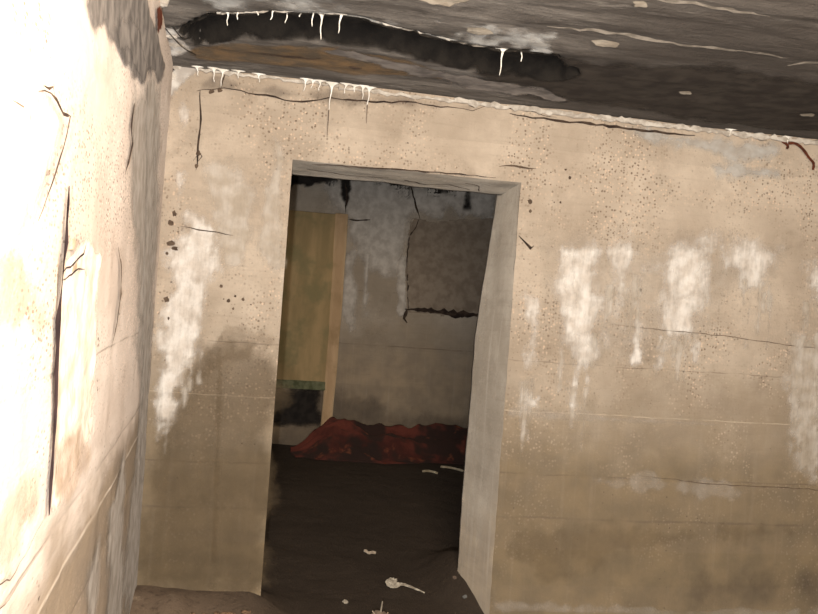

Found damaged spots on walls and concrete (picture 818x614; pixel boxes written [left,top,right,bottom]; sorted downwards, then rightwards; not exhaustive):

crack [193,75,485,169]
spalling [179,11,581,82]
water stain [374,20,489,47]
water stain [171,35,818,157]
crack [0,86,87,609]
crack [111,247,122,347]
water stain [88,0,253,614]
water stain [273,379,325,426]
water stain [291,175,494,330]
crack [308,165,536,323]
water stain [556,244,641,419]
water stain [659,237,713,380]